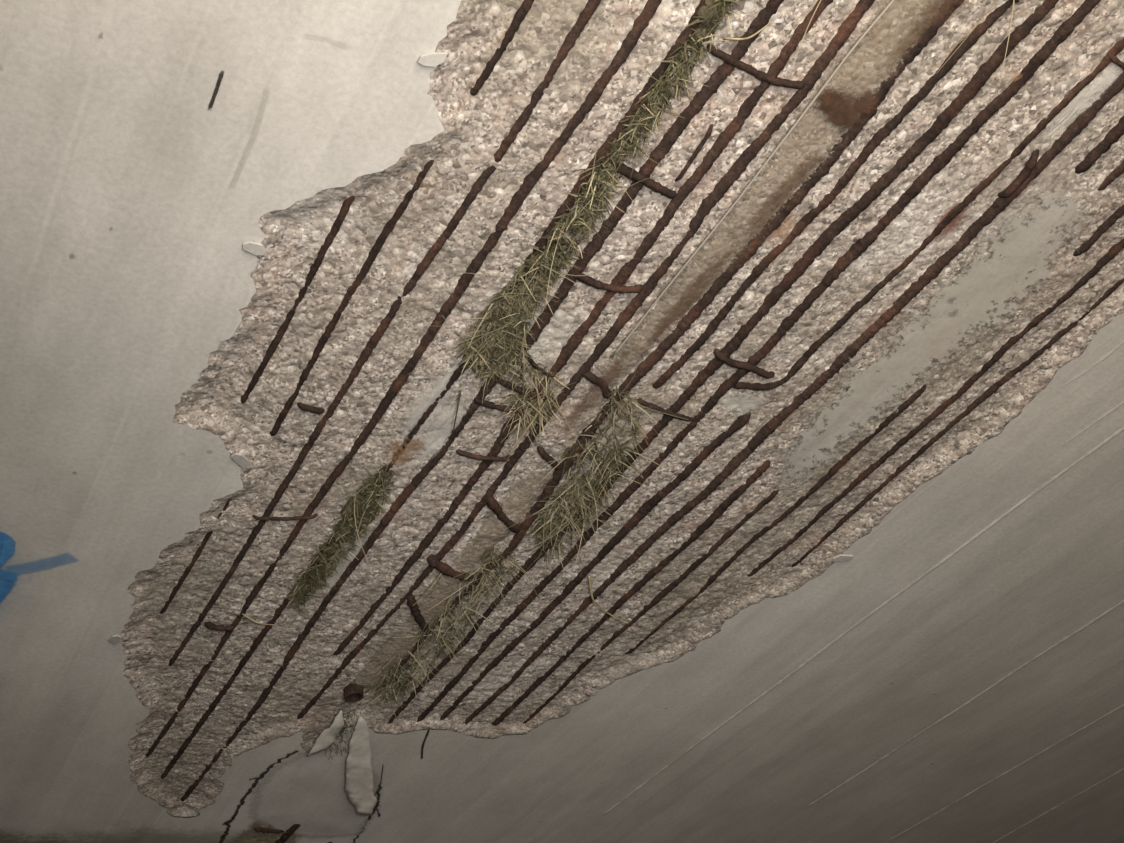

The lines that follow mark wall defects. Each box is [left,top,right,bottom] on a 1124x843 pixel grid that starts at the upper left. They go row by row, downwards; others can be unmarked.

rust [815,89,878,128]
spalling [512,0,768,342]
spalling [583,0,888,375]
spalling [730,0,1085,362]
spalling [484,277,718,524]
spalling [677,363,738,417]
spalling [440,505,496,566]
spalling [482,531,515,570]
crack [219,750,298,843]
spalling [234,822,300,843]
peeling [307,710,346,757]
peeling [345,716,377,817]